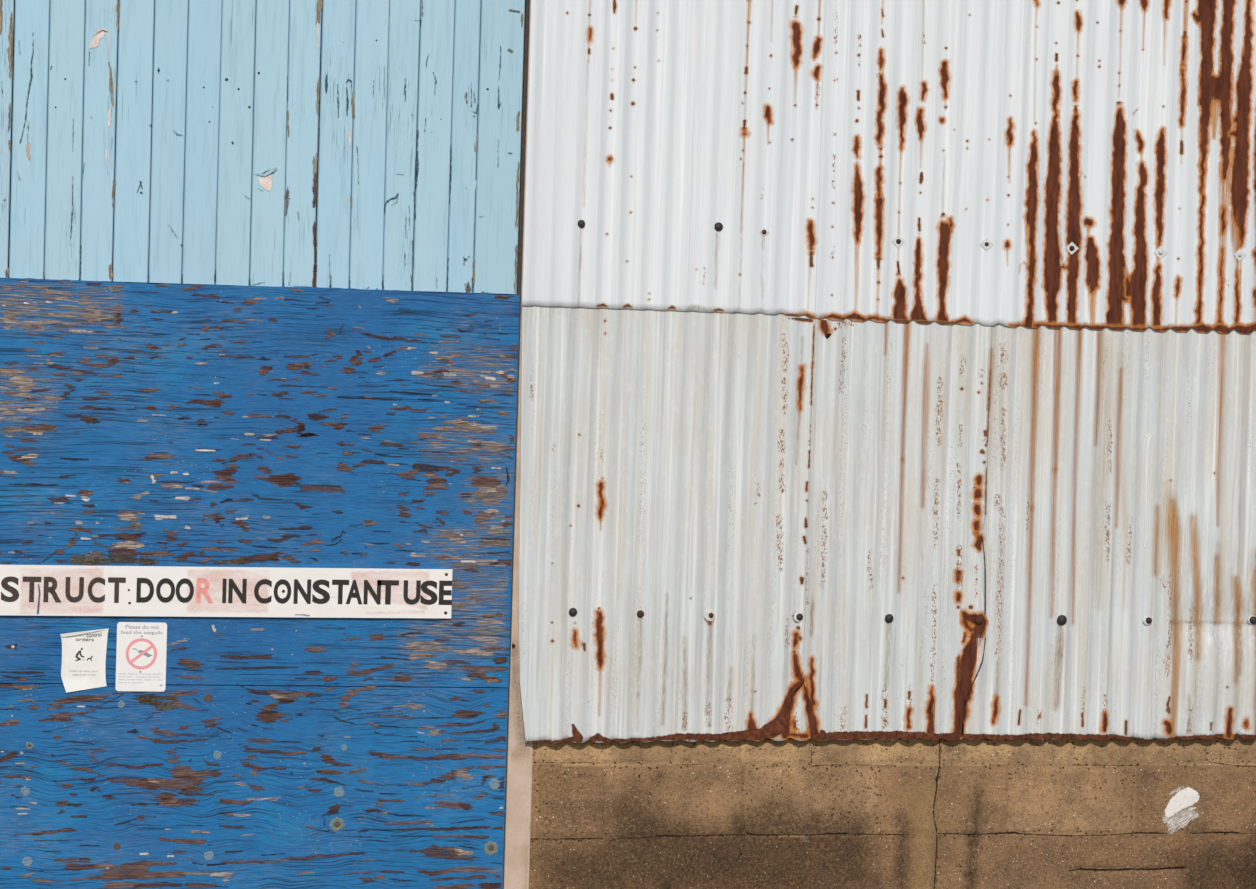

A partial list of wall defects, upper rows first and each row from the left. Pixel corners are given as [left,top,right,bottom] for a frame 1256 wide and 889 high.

peeling [0,0,13,78]
peeling [88,0,120,126]
rust [764,105,772,125]
rust [791,5,838,106]
rust [852,9,955,284]
rust [1006,117,1014,161]
rust [807,198,816,267]
rust [782,213,973,483]
rust [1009,0,1256,586]
peeling [0,93,519,889]
rust [527,344,1256,744]
crack [531,739,1256,889]